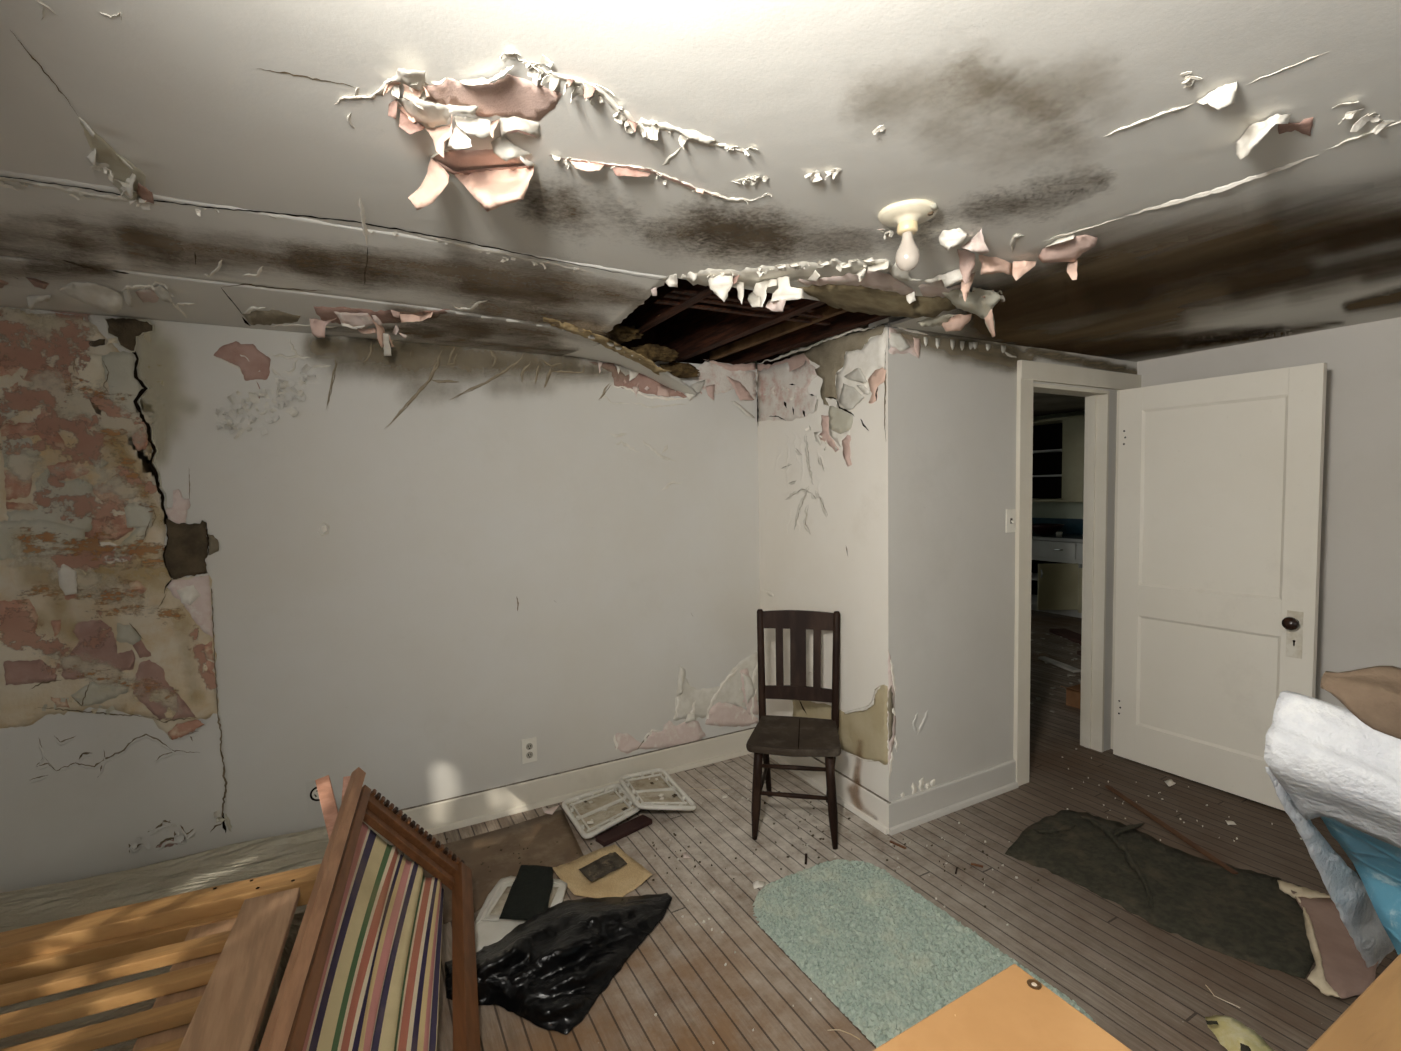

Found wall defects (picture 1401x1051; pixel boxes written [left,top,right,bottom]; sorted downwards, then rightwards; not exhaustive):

leakage [0,226,641,378]
peeling [262,52,772,212]
leakage [521,190,588,222]
leakage [647,209,852,258]
peeling [543,101,1401,466]
leakage [897,207,1401,375]
peeling [1104,51,1330,137]
peeling [0,277,219,740]
crack [132,351,190,608]
crack [773,428,830,537]
crack [29,589,232,855]
peeling [792,650,899,780]